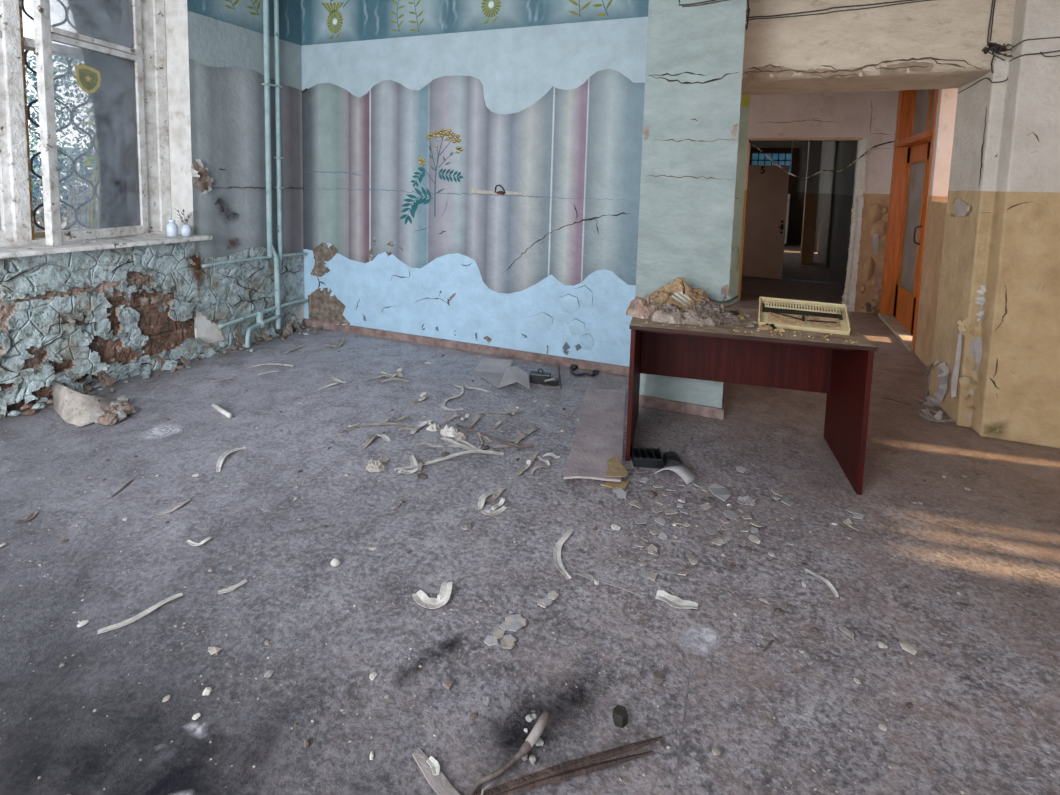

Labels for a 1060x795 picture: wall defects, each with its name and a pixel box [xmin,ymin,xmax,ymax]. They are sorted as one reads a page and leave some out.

spalling [0,268,218,419]
spalling [224,242,350,348]